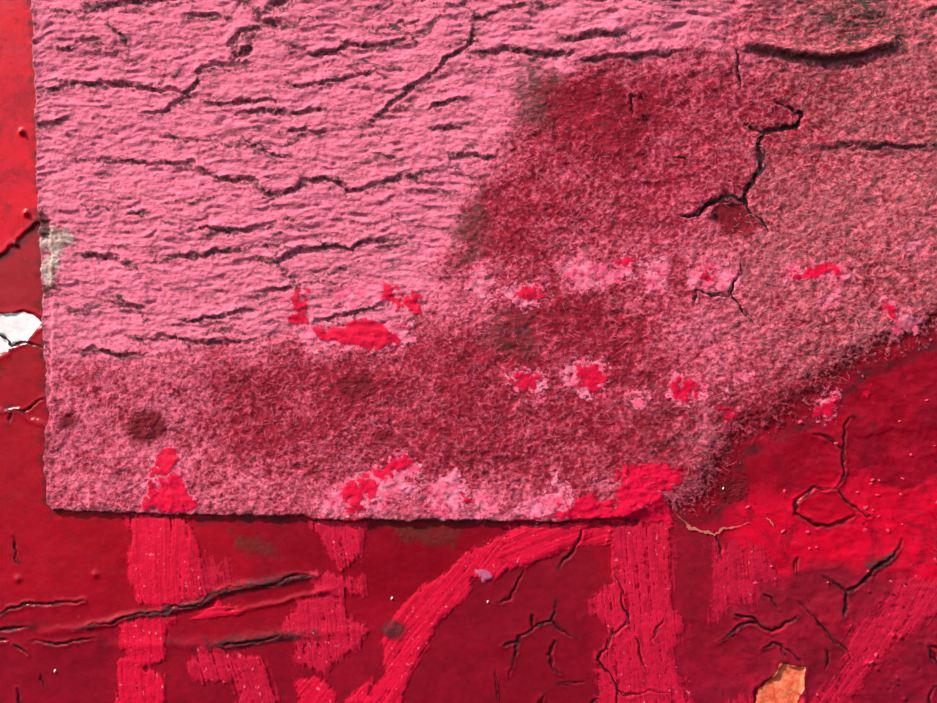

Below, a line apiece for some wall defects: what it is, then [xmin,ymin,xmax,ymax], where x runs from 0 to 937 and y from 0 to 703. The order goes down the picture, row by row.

crack [734,50,742,86]
crack [631,92,647,128]
crack [682,102,803,232]
crack [694,258,757,327]
crack [794,415,872,527]
crack [0,575,308,652]
crack [558,527,584,569]
crack [494,568,672,703]
peeling [677,514,749,536]
crack [720,595,855,669]
crack [822,539,903,614]
peeling [755,664,806,703]